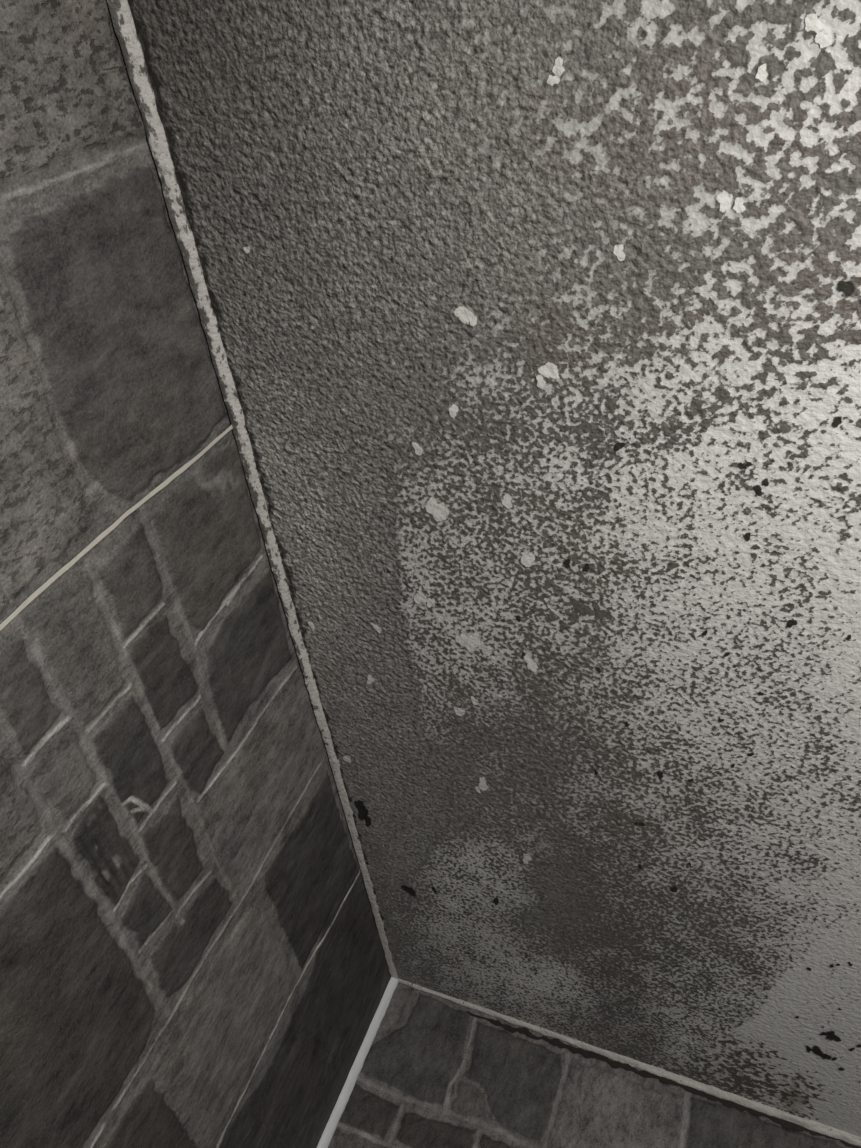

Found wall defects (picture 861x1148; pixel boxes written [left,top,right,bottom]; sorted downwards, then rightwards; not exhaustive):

damp [831,5,856,24]
damp [654,364,674,398]
damp [664,355,681,380]
damp [820,414,861,435]
damp [196,471,238,491]
damp [702,427,788,530]
damp [781,464,861,555]
damp [569,593,734,658]
damp [824,688,855,718]
damp [704,723,764,773]
damp [806,988,861,1071]
damp [467,1011,861,1148]